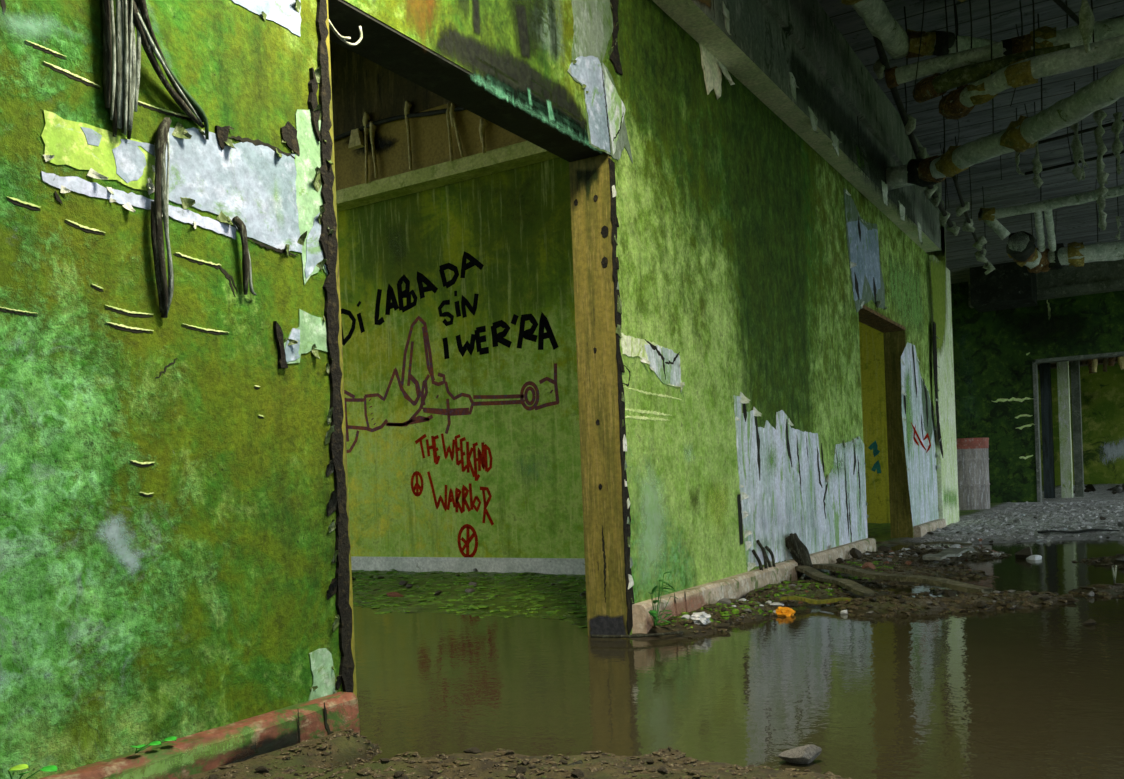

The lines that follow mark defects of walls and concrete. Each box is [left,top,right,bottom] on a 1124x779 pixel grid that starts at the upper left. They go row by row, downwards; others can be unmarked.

peeling [41,0,355,701]
peeling [567,0,685,635]
peeling [734,392,869,572]
peeling [901,322,943,526]